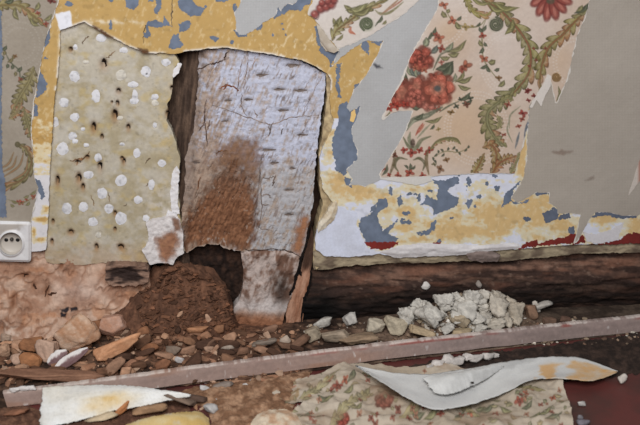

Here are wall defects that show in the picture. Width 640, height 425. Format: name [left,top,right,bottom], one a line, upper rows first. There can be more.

peeling [274,0,311,36]
peeling [361,40,383,55]
flaking render [34,0,243,301]
damp [155,141,260,262]
crack [198,51,320,171]
peeling [314,26,360,188]
flaking render [316,175,482,257]
peeling [485,174,529,208]
peeling [542,207,571,223]
flaking render [518,212,640,249]